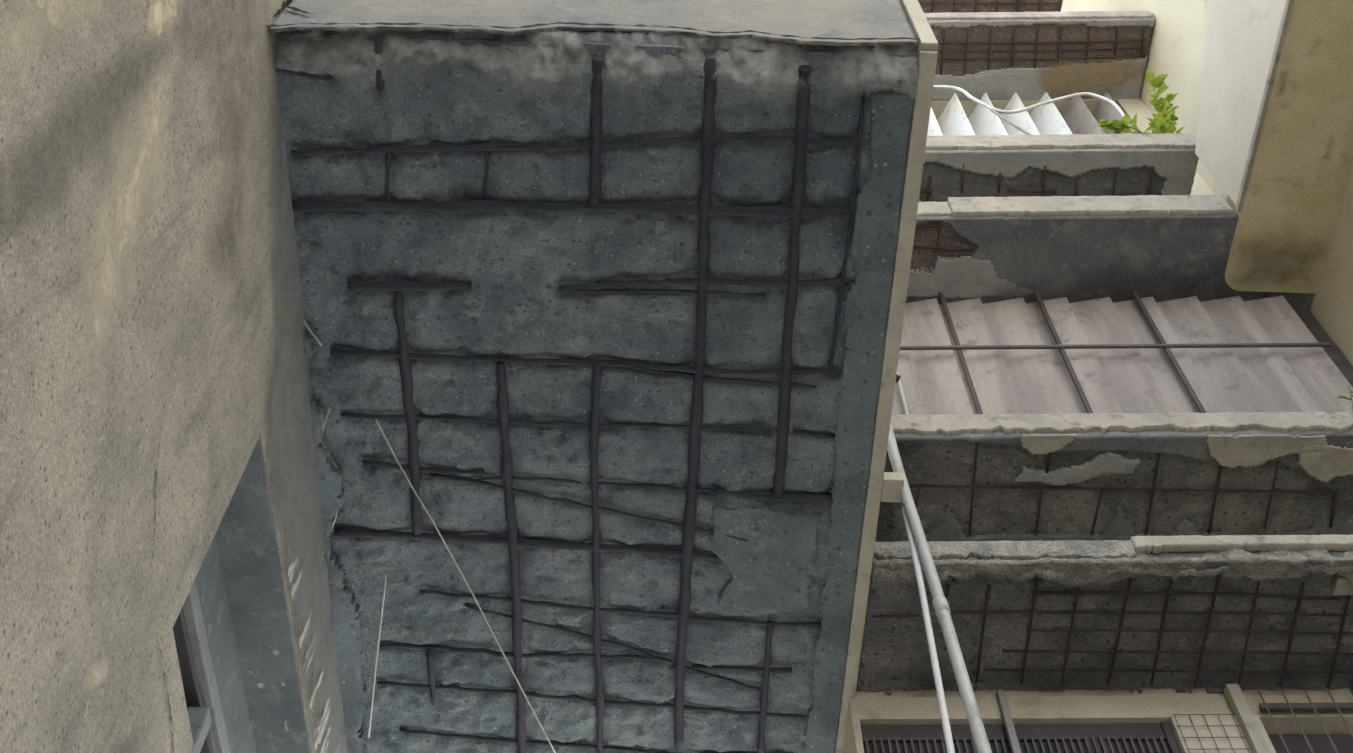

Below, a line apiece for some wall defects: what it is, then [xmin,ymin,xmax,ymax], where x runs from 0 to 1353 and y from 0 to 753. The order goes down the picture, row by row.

spalling [918,0,1152,76]
spalling [910,221,977,270]
spalling [919,161,1167,202]
spalling [275,29,918,753]
spalling [857,433,1353,692]
crack [153,618,174,752]